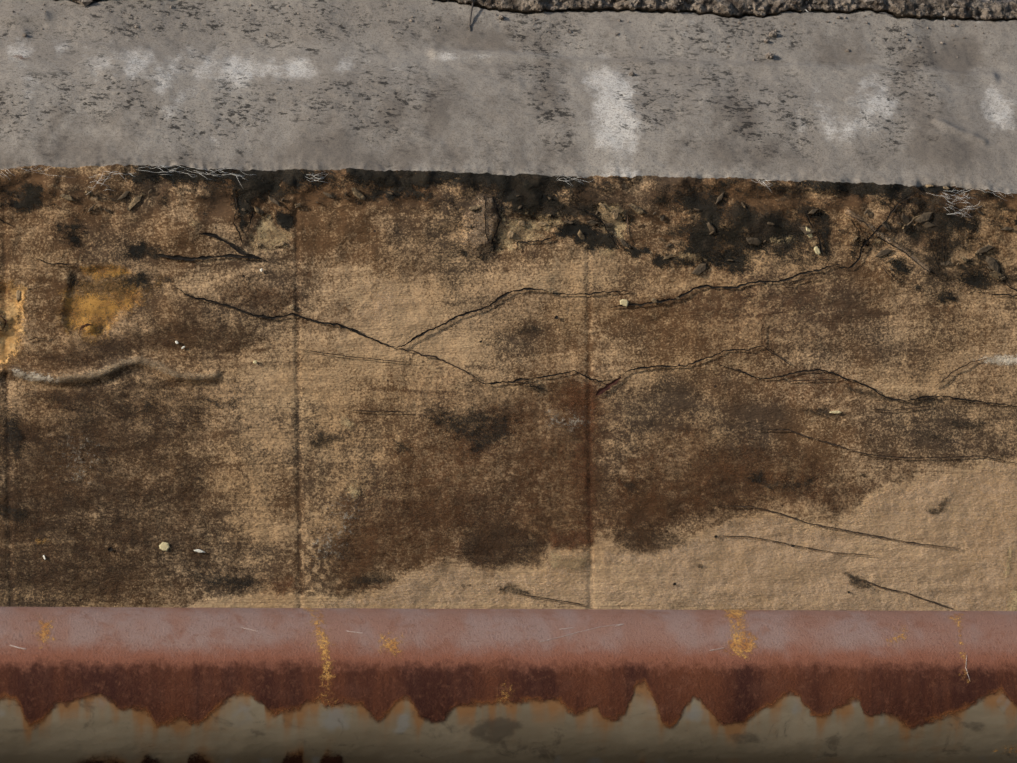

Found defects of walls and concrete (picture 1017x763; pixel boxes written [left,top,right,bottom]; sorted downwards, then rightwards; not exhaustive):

water stain [0,165,1017,304]
crack [176,191,1017,411]
water stain [0,312,262,607]
crack [767,429,1017,464]
water stain [309,377,846,594]
crack [714,505,961,556]
water stain [844,571,871,589]
crack [863,579,954,609]
rust [0,607,1017,729]
rust [188,753,209,763]
rust [282,752,303,763]
rust [320,755,343,763]